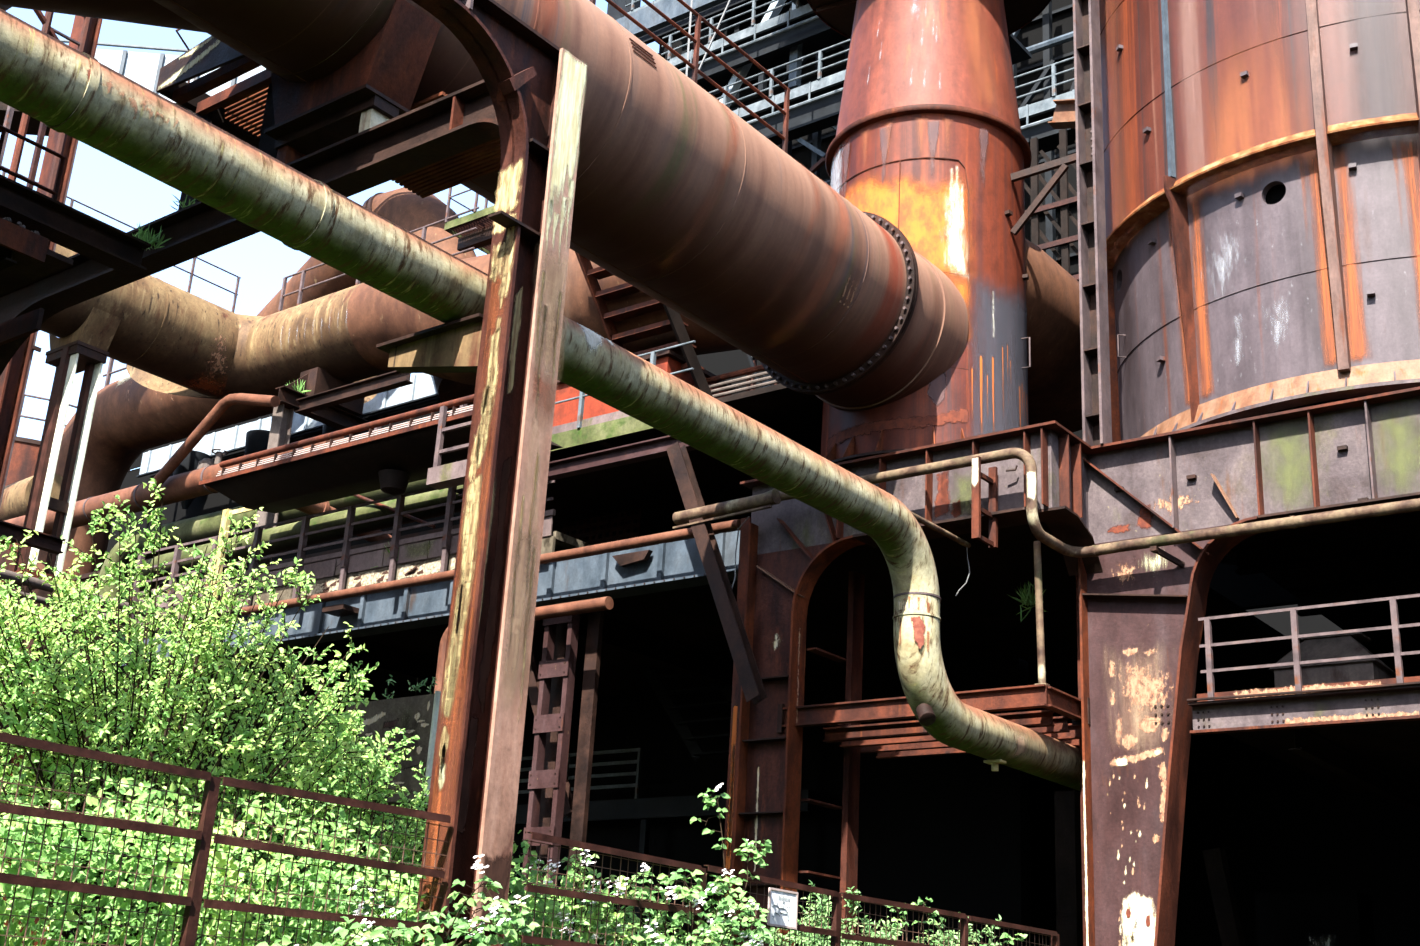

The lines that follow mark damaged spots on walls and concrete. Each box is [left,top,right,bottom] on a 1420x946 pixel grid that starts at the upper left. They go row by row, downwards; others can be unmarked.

rust [843,120,967,302]
rust [979,129,988,179]
rust [1300,149,1366,364]
rust [1393,138,1420,299]
rust [972,345,1011,426]
peeling [1109,747,1167,946]